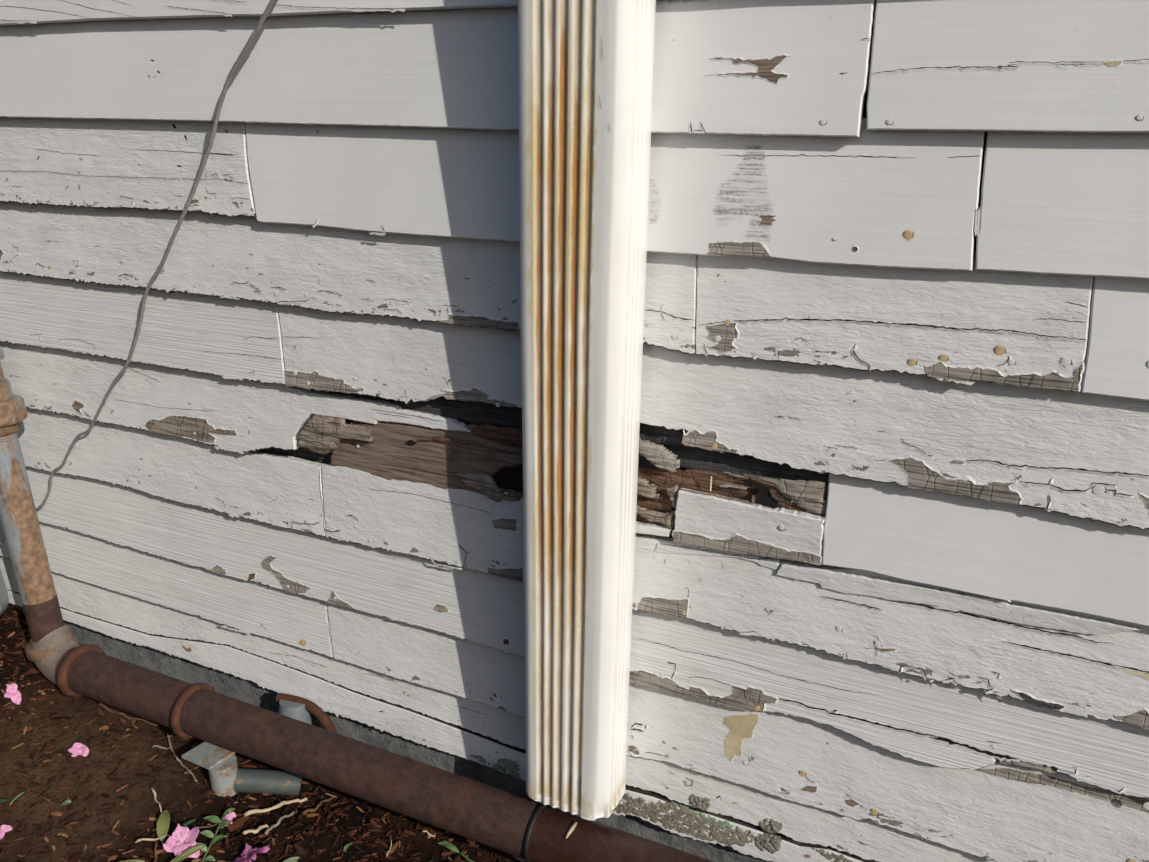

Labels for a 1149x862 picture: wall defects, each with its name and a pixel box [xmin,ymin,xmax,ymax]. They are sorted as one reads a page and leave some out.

peeling [705,53,791,85]
crack [839,59,1149,77]
peeling [706,213,778,258]
rust [527,32,595,607]
peeling [706,320,740,354]
peeling [924,360,1085,392]
peeling [144,414,237,443]
peeling [683,428,739,453]
spalling [741,478,779,509]
peeling [888,455,1023,505]
peeling [629,669,778,761]
peeling [976,768,1149,813]